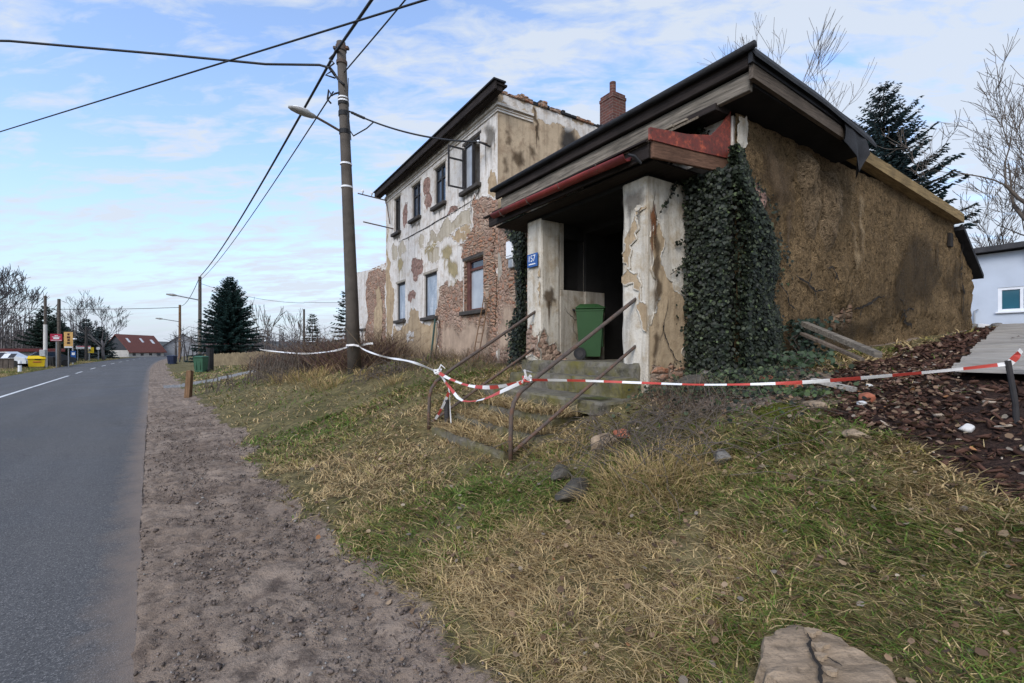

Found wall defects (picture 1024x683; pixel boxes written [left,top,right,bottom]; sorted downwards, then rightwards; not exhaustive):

leakage [504,139,534,171]
peeling [364,168,569,362]
peeling [622,205,690,389]
crack [660,301,684,367]